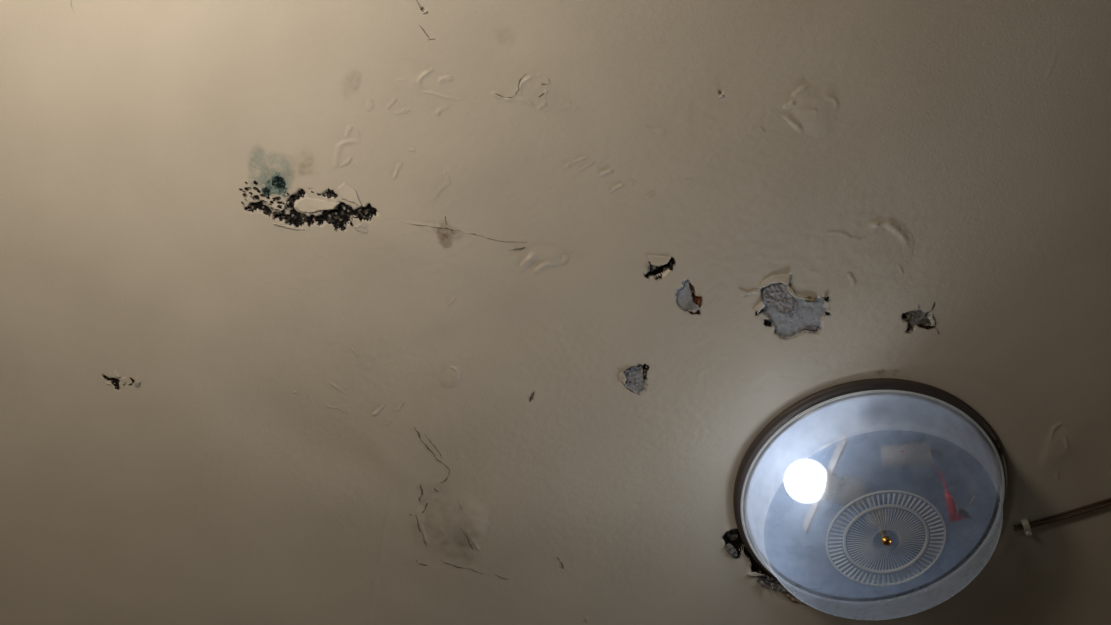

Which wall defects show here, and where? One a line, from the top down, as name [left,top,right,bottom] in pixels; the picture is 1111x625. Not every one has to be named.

damp [239,152,377,232]
spalling [644,255,675,280]
peeling [676,279,702,314]
peeling [741,274,830,339]
peeling [902,302,939,334]
spalling [102,370,140,390]
peeling [619,364,649,395]
spalling [723,529,831,609]